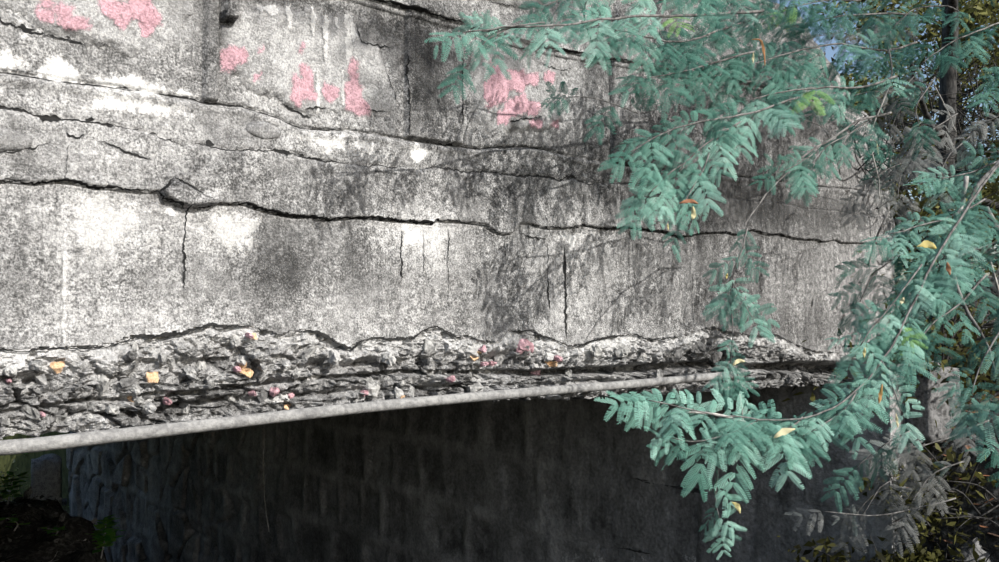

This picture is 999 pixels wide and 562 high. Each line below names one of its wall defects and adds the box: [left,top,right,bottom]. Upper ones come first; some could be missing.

crack [0,18,84,45]
crack [376,0,462,22]
crack [1,72,340,131]
crack [356,24,879,217]
crack [0,105,871,352]
spalling [0,324,894,439]